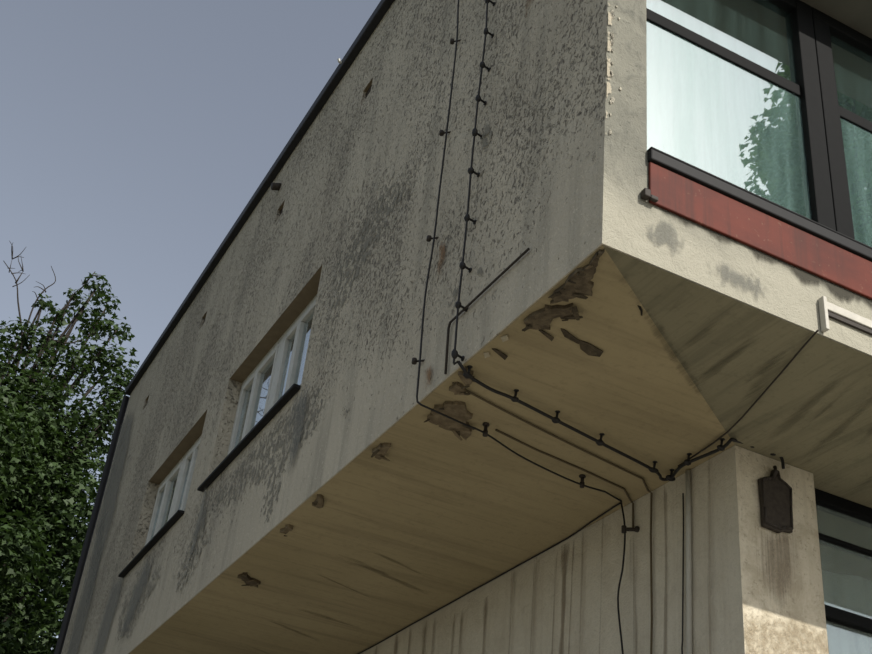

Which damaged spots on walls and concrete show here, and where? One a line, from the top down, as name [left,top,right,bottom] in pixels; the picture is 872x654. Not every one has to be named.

flaking render [522,248,605,357]
peeling [176,386,325,592]
flaking render [371,443,391,461]
flaking render [424,367,475,440]